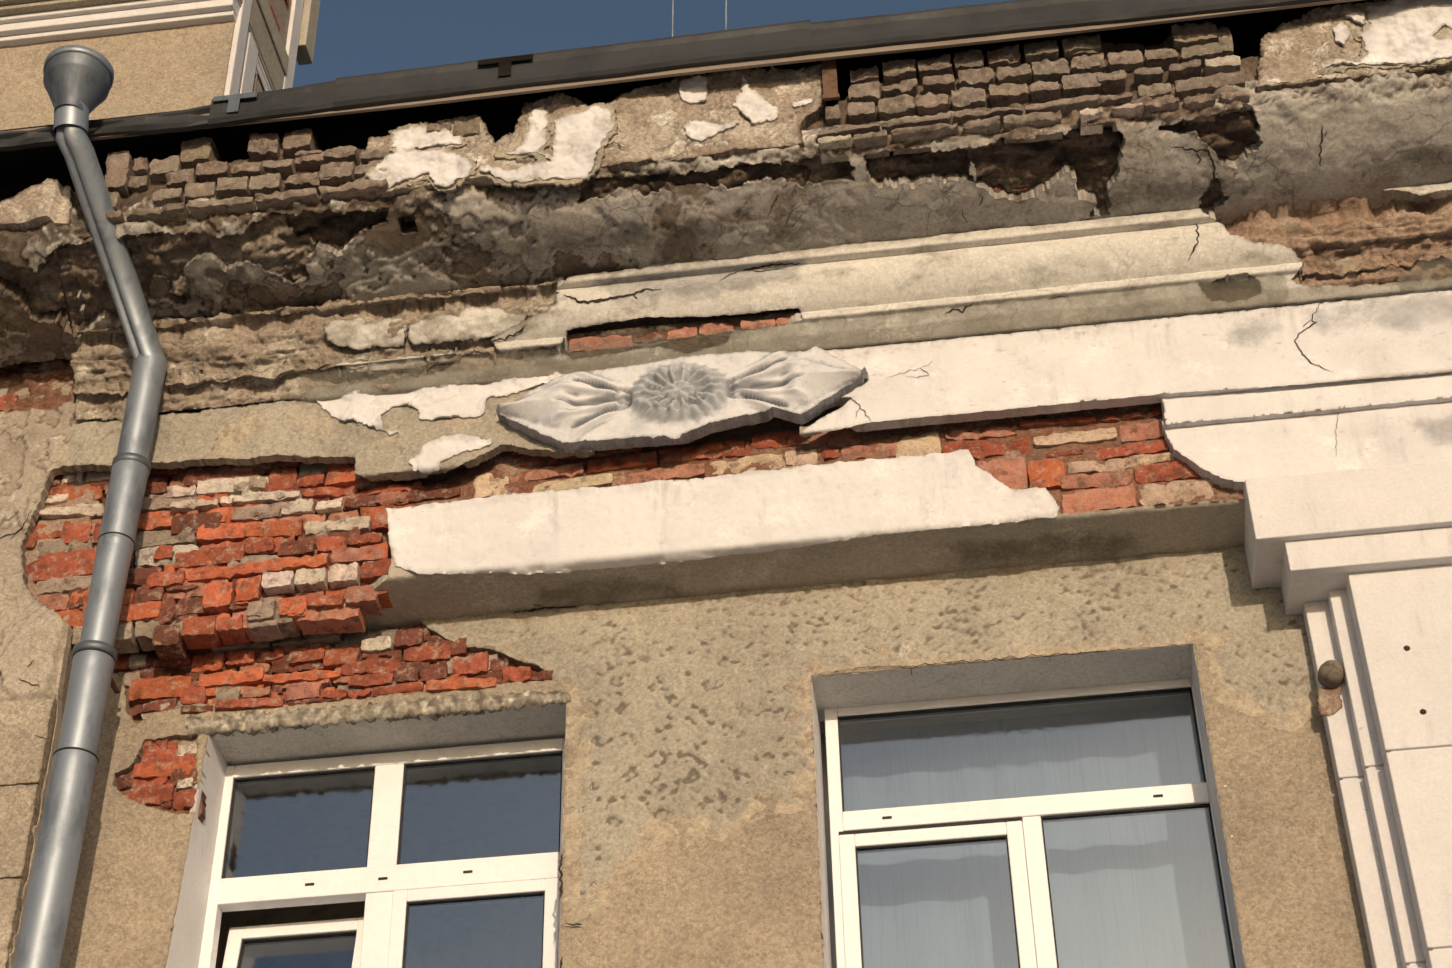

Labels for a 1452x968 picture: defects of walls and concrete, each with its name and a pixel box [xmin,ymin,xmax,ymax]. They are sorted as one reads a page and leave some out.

peeling [1318,0,1452,74]
flaking render [679,21,1260,165]
flaking render [105,103,618,240]
crack [1167,146,1220,256]
spalling [1199,178,1223,209]
spalling [0,231,92,324]
crack [565,288,662,304]
crack [1294,305,1332,372]
flaking render [0,359,75,413]
flaking render [25,471,111,646]
flaking render [113,308,1343,924]